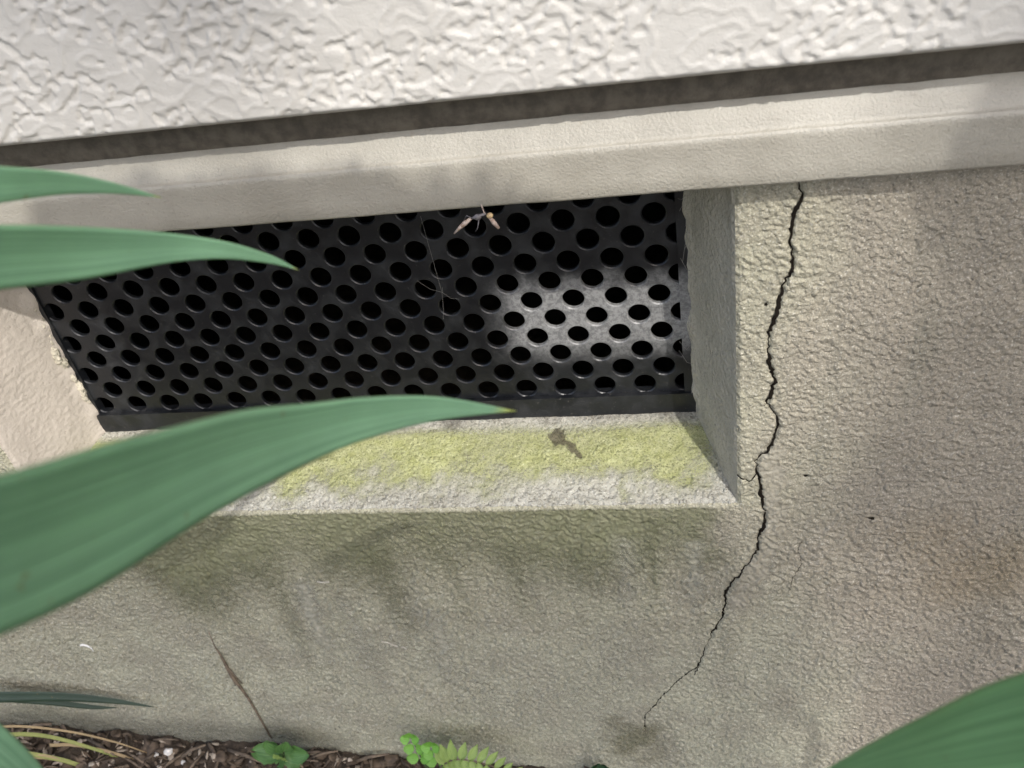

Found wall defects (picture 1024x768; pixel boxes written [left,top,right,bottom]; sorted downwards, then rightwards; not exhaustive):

crack [644,182,804,733]